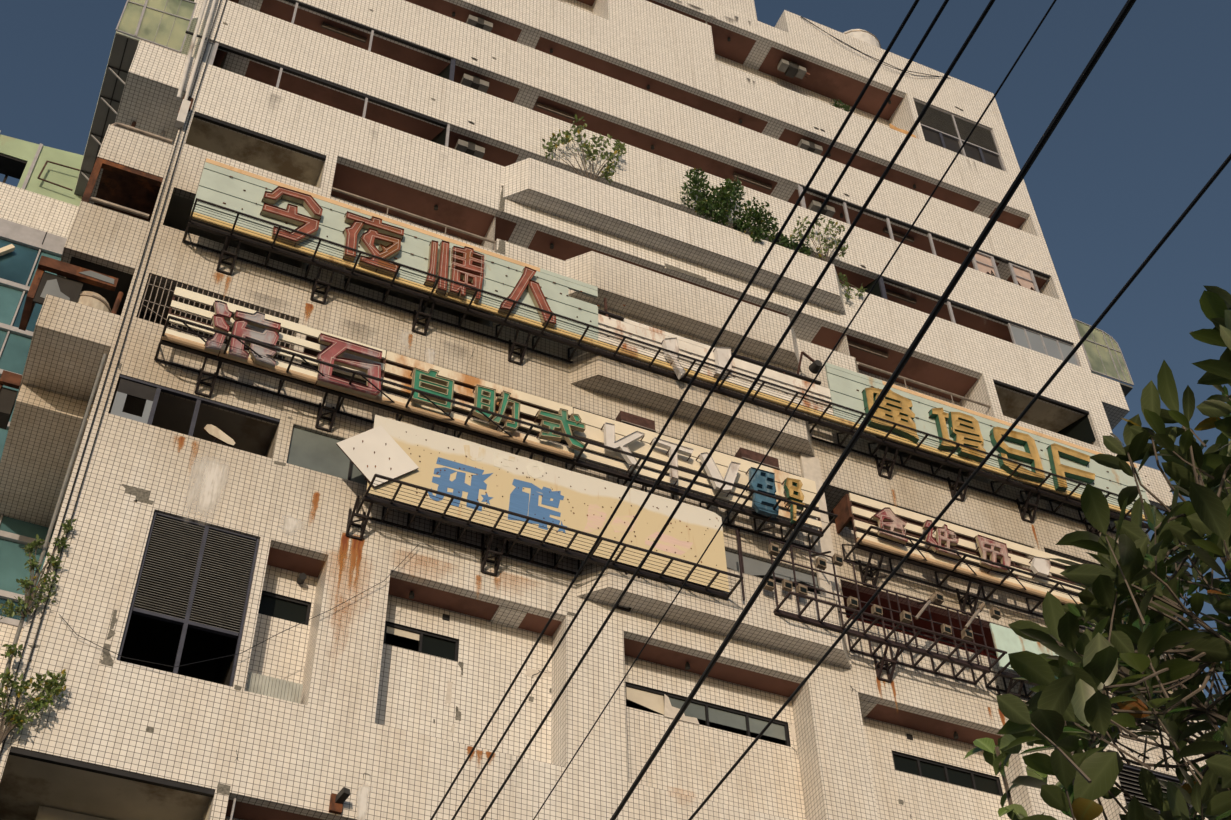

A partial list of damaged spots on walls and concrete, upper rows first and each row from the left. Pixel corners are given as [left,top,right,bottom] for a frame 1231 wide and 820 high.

peeling [118,483,154,505]
damp [188,460,227,511]
corrosion [339,532,365,583]